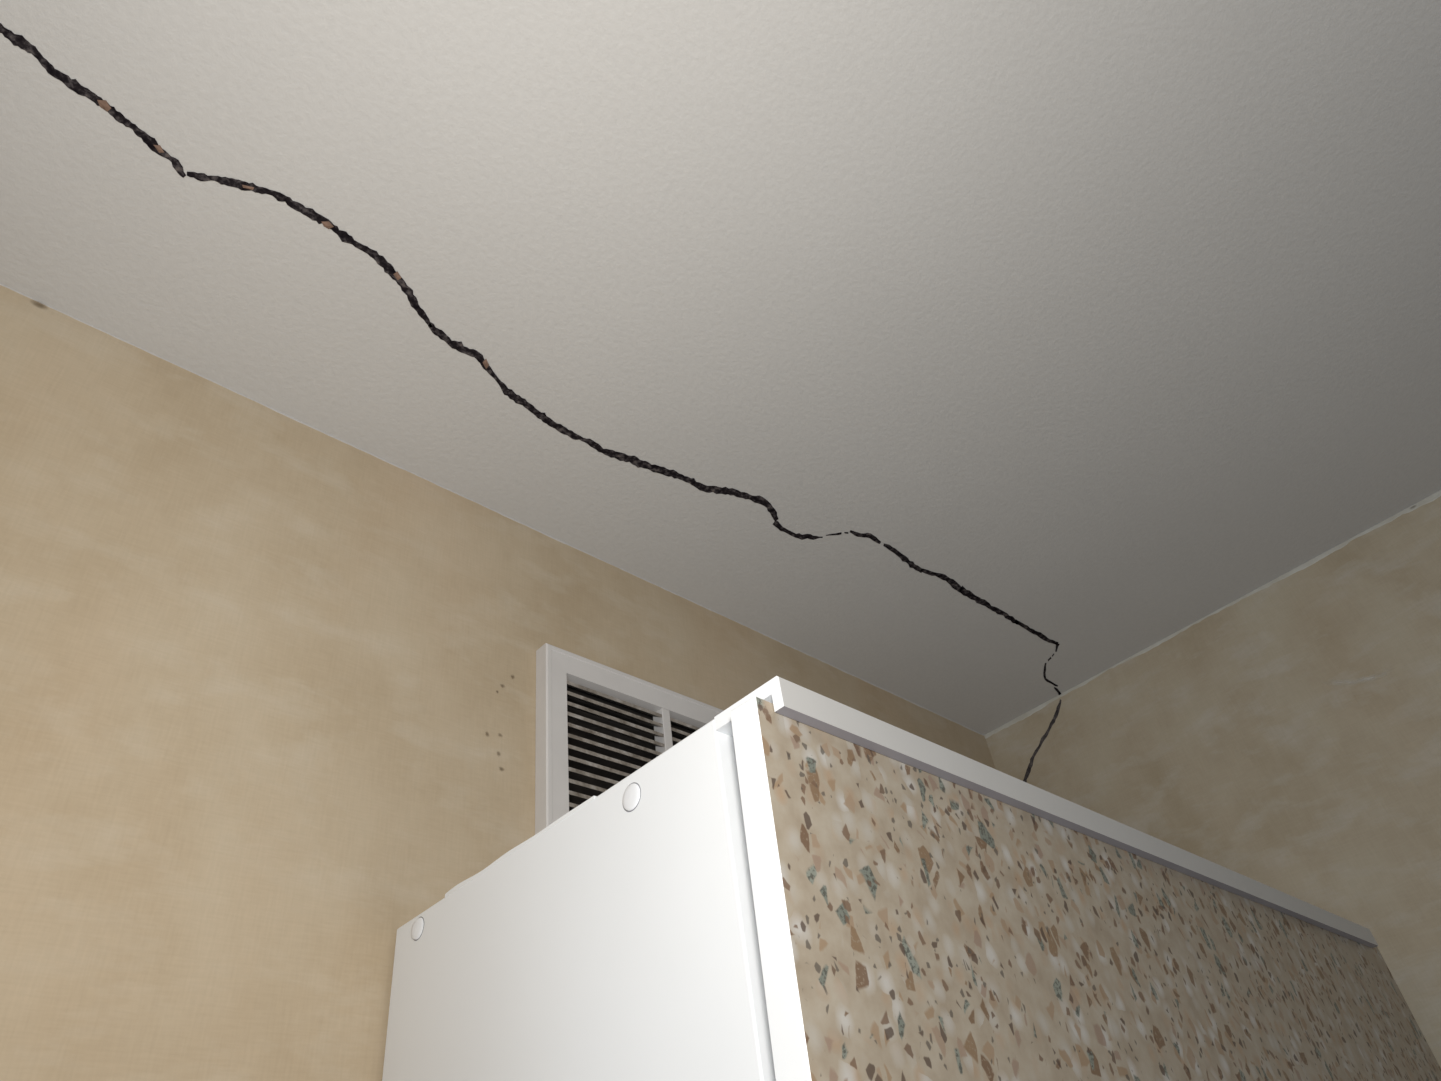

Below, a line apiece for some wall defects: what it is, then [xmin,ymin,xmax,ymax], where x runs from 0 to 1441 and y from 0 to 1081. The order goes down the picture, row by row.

crack [0,23,1061,783]